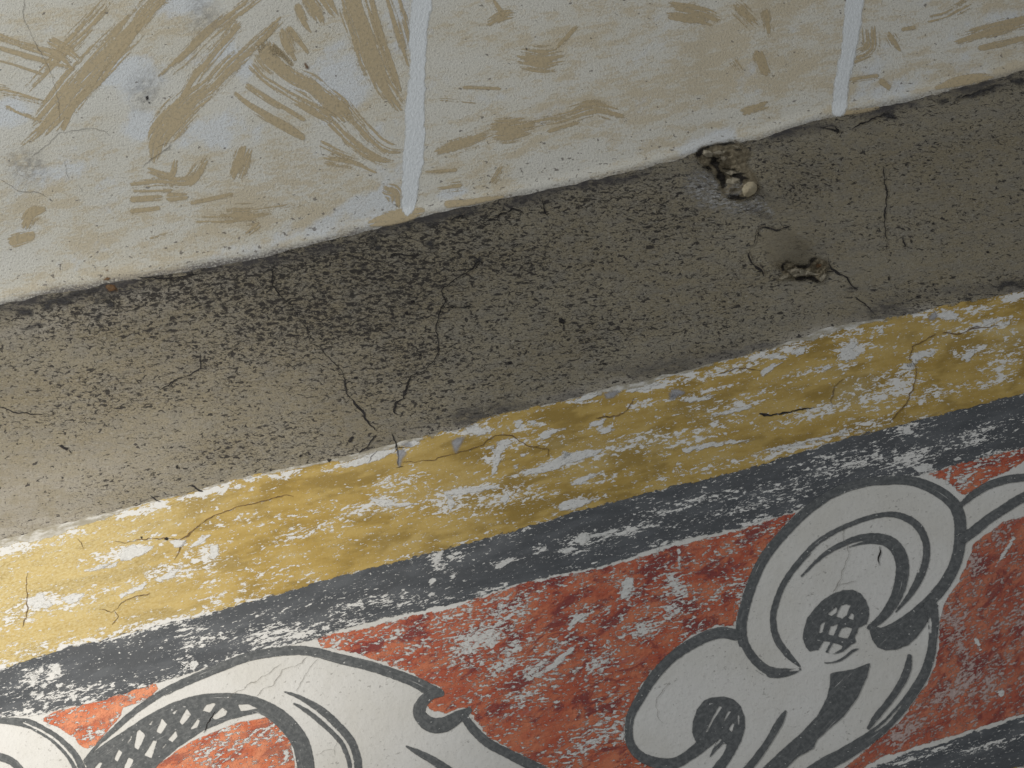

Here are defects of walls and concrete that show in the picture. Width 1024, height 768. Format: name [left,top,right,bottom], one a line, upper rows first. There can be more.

spalling [696,142,760,201]
crack [748,221,790,276]
crack [827,258,872,311]
crack [271,259,549,468]
crack [759,379,843,416]
crack [891,325,997,420]
peeling [327,440,419,467]
peeling [443,410,513,511]
peeling [514,449,602,476]
peeling [84,534,219,572]
crack [116,495,291,560]
peeling [533,529,623,555]